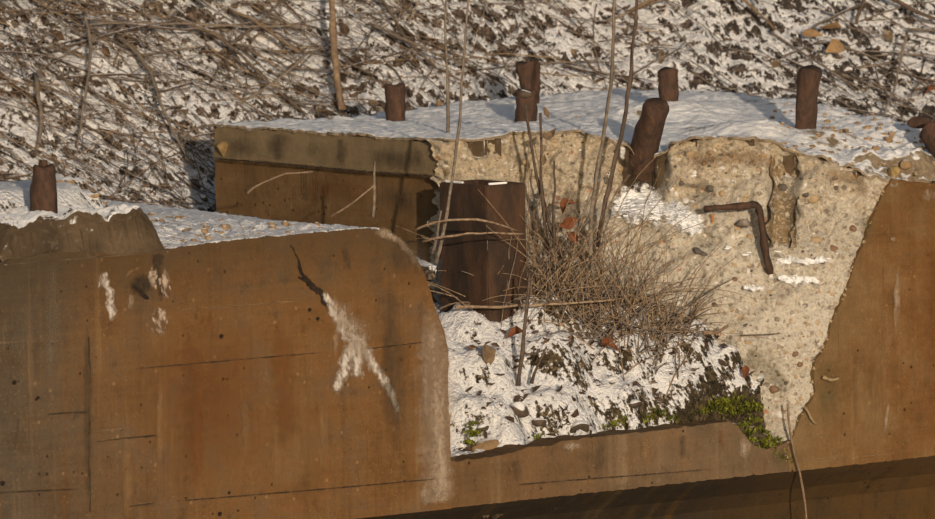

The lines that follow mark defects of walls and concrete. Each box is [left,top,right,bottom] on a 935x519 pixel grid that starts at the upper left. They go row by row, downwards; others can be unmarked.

spalling [665,144,730,214]
spalling [801,177,838,204]
leakage [99,273,116,318]
crack [293,247,329,308]
spalling [380,230,416,263]
corrosion [703,200,774,275]
leakage [324,294,399,411]
spalling [750,332,803,419]